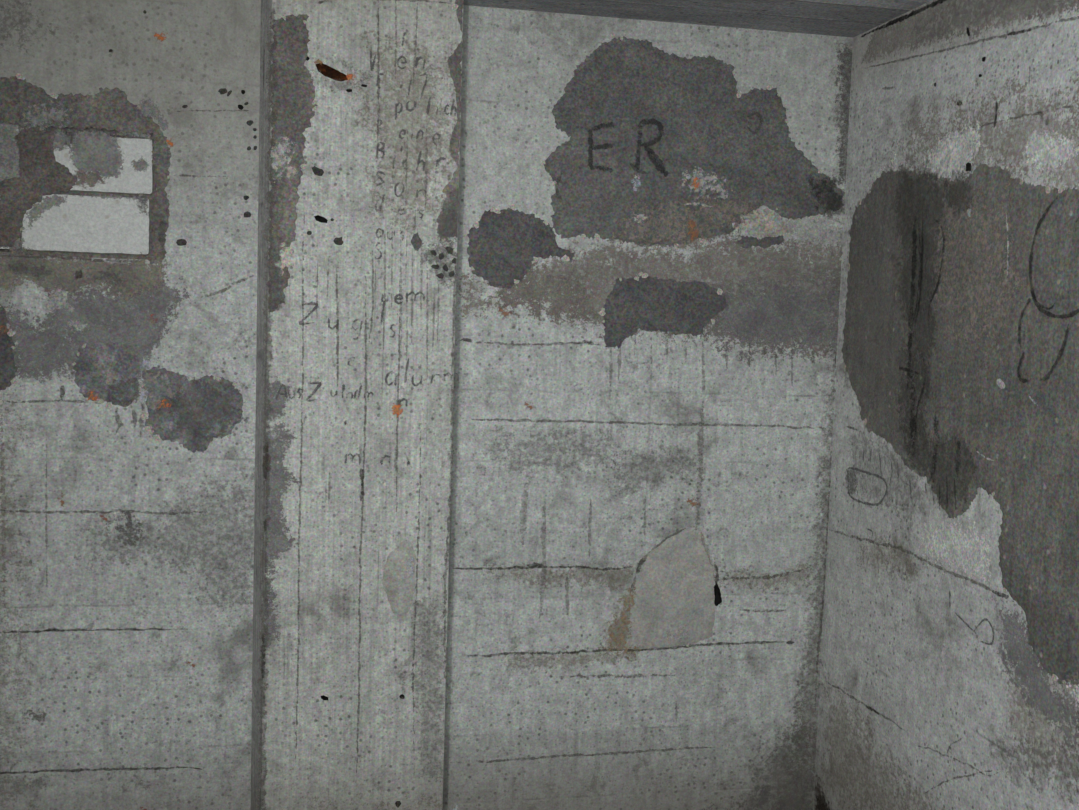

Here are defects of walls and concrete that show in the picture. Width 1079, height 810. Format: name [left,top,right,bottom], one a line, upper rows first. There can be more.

peeling [0,73,187,265]
peeling [218,14,334,312]
peeling [411,0,844,290]
peeling [0,306,18,390]
peeling [60,342,247,453]
peeling [599,272,728,349]
peeling [842,163,1079,702]
spalling [714,584,722,606]